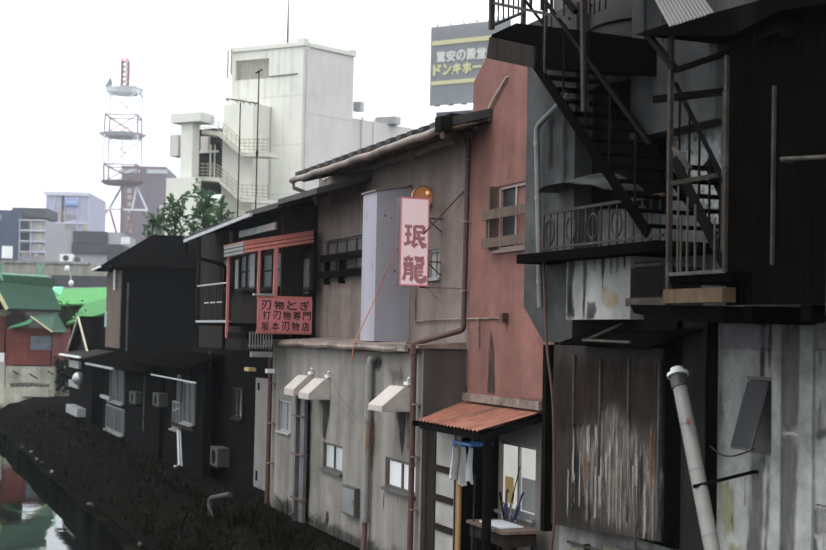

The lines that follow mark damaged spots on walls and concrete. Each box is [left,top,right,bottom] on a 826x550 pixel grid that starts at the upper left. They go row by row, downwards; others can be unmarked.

water stain [760,324,771,377]
water stain [781,325,800,550]
water stain [731,456,768,550]
water stain [814,510,826,550]